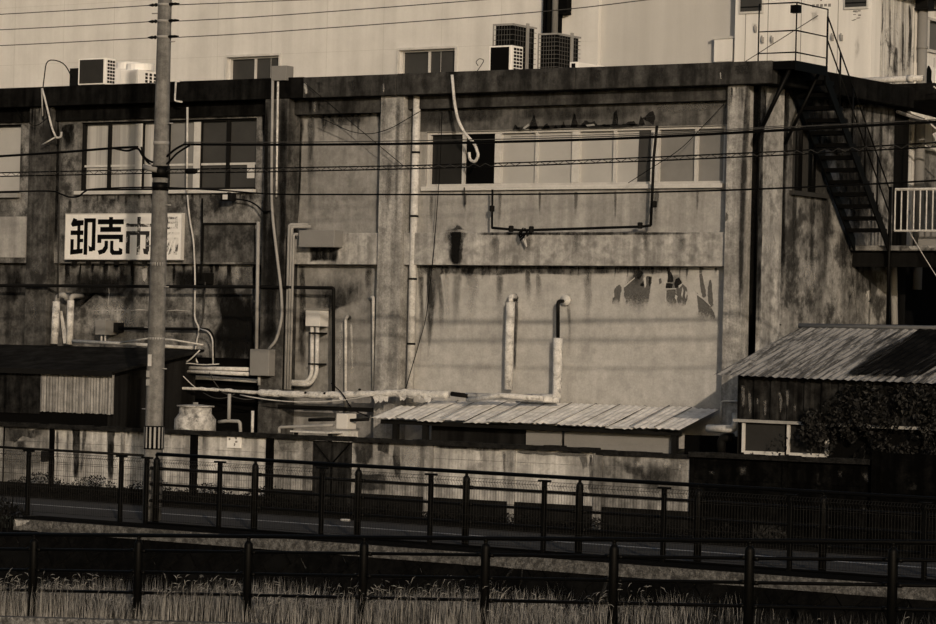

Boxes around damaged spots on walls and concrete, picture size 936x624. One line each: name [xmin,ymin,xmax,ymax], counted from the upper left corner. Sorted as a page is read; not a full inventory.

water stain [298,82,385,211]
peeling [513,105,655,131]
water stain [65,264,150,323]
water stain [173,108,287,359]
water stain [310,248,339,261]
water stain [419,225,688,334]
flaking render [613,267,715,318]
water stain [317,286,358,371]
water stain [56,430,86,477]
water stain [107,431,115,477]